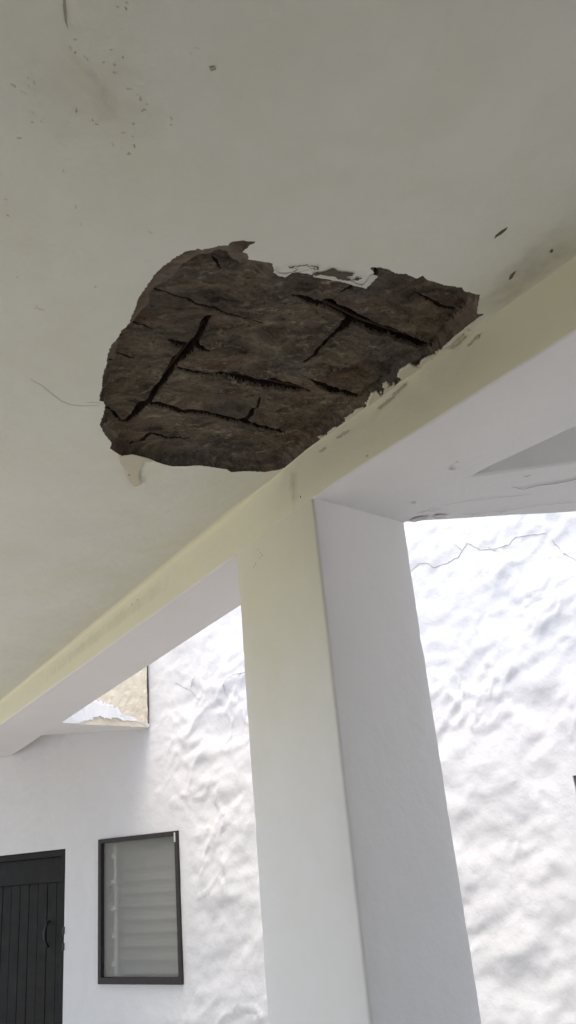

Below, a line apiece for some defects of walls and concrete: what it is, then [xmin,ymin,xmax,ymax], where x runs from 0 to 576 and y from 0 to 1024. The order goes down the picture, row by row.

spalling [99,240,488,487]
peeling [410,502,448,522]
crack [411,532,576,571]